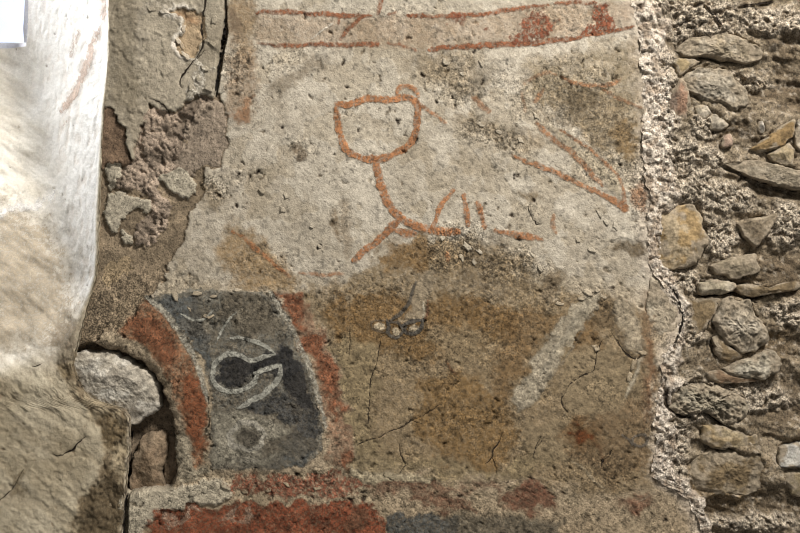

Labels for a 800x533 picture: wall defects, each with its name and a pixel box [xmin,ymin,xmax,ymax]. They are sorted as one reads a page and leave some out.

crack [180,0,226,94]
flaking render [77,0,229,351]
crack [358,343,440,475]
crack [561,331,640,412]